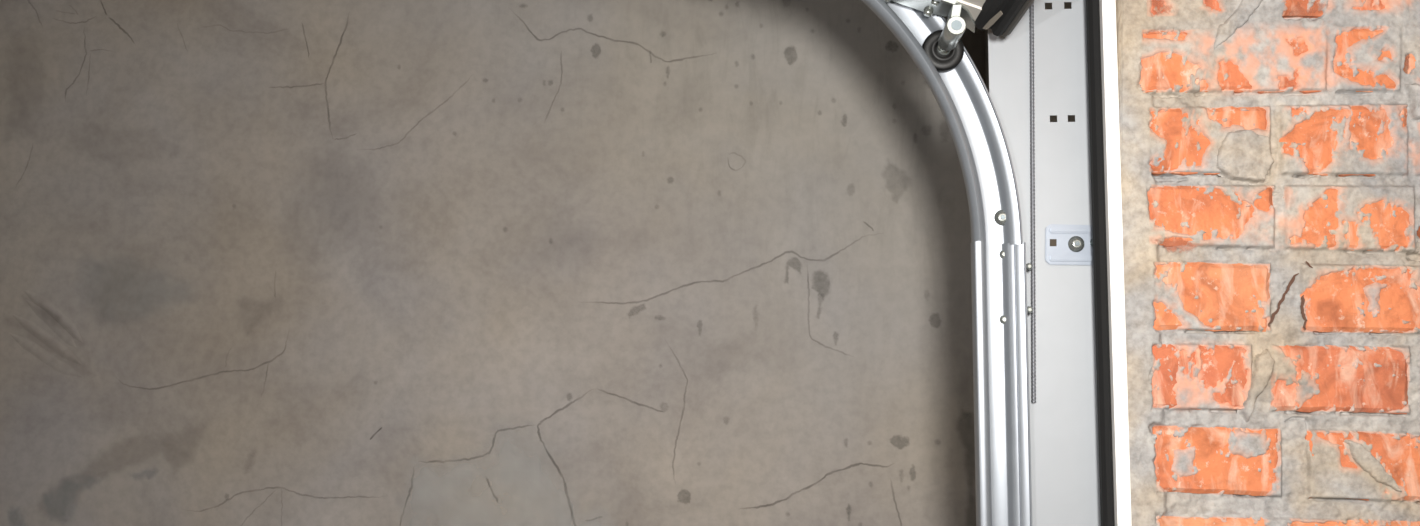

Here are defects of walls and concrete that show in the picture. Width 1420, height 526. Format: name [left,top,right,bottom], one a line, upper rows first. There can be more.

crack [1268,261,1313,330]